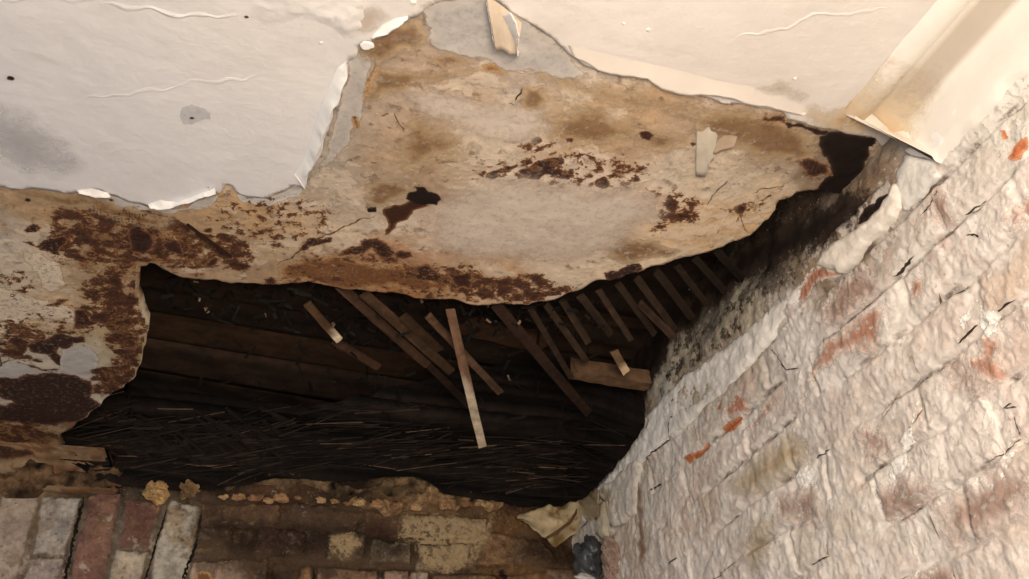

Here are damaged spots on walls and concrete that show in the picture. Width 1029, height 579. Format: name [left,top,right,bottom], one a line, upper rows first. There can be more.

leakage [0,186,173,280]
flaking render [0,0,882,445]
leakage [603,238,679,264]
crack [893,256,914,277]
crack [965,201,986,237]
mould [659,238,826,401]
crack [958,300,1015,344]
crack [646,416,672,494]
spalling [684,443,711,464]
leakage [731,435,805,495]
crack [985,403,1021,463]
flaking render [595,459,643,538]